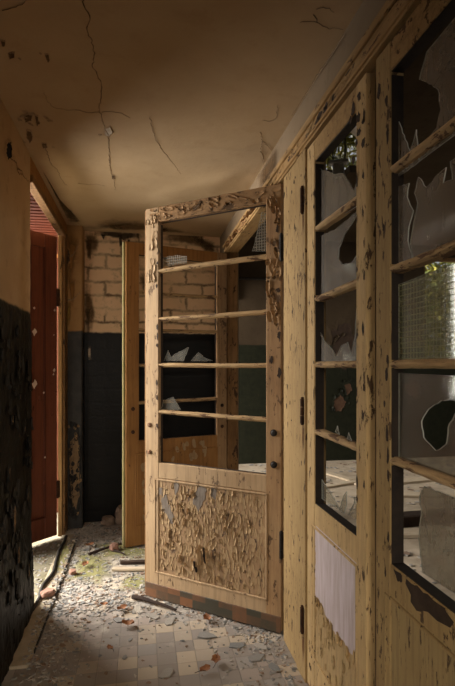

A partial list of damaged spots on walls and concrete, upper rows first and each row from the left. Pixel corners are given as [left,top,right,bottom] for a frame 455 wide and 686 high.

crack [44,0,130,186]
peeling [349,92,365,148]
peeling [68,421,82,521]
peeling [0,466,34,616]
peeling [159,480,265,598]
peeling [309,526,356,686]
peeling [384,568,454,628]